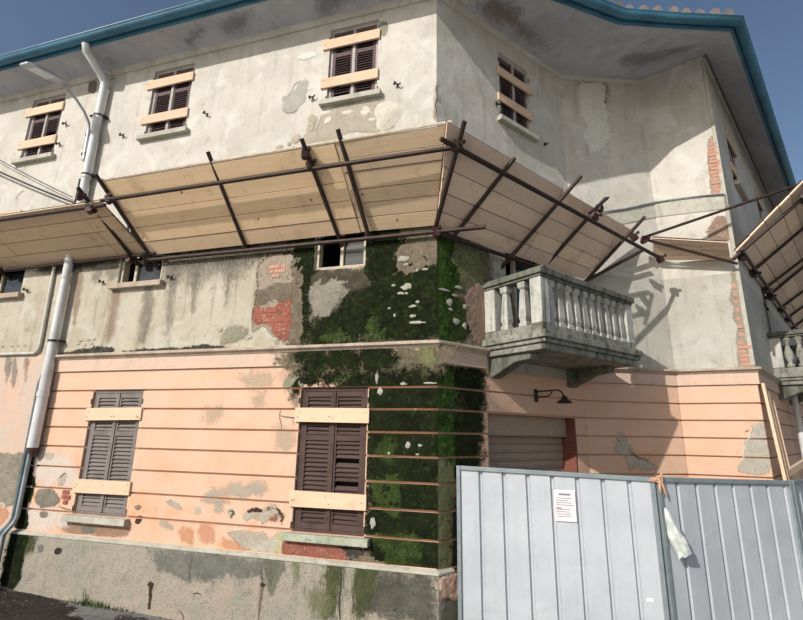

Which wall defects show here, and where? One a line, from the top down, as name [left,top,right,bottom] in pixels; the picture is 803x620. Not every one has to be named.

peeling [282,80,309,114]
peeling [575,81,615,211]
flaking render [707,135,722,194]
damp [163,240,293,269]
damp [35,259,120,323]
damp [107,290,120,340]
peeling [217,254,352,345]
damp [440,285,467,330]
flaking render [730,270,752,367]
spalling [738,421,771,475]
flaking render [159,481,384,564]
damp [147,549,300,596]